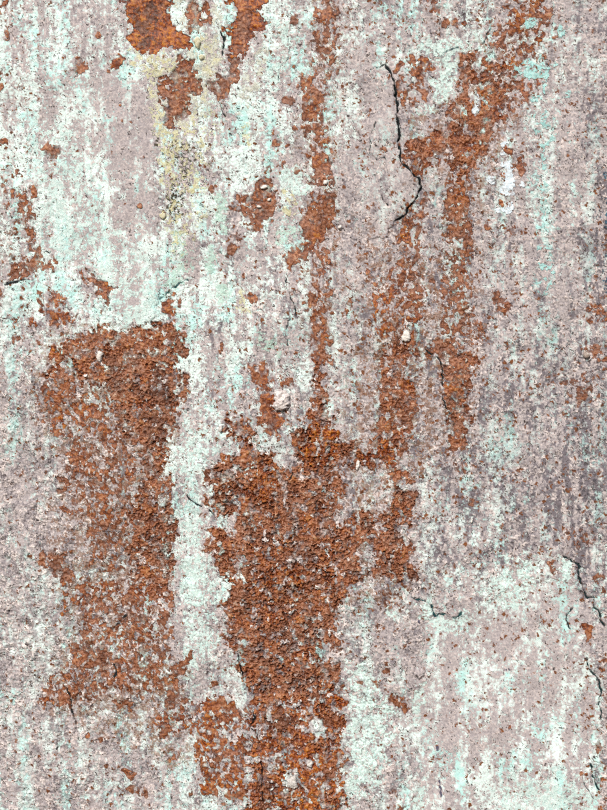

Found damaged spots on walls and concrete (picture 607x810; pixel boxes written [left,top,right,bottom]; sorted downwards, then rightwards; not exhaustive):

rust [107,53,126,73]
rust [119,0,271,129]
rust [310,0,342,65]
crack [369,64,422,221]
rust [0,175,58,281]
rust [393,0,559,453]
rust [29,56,430,810]
crack [563,556,605,629]
rust [581,623,594,645]